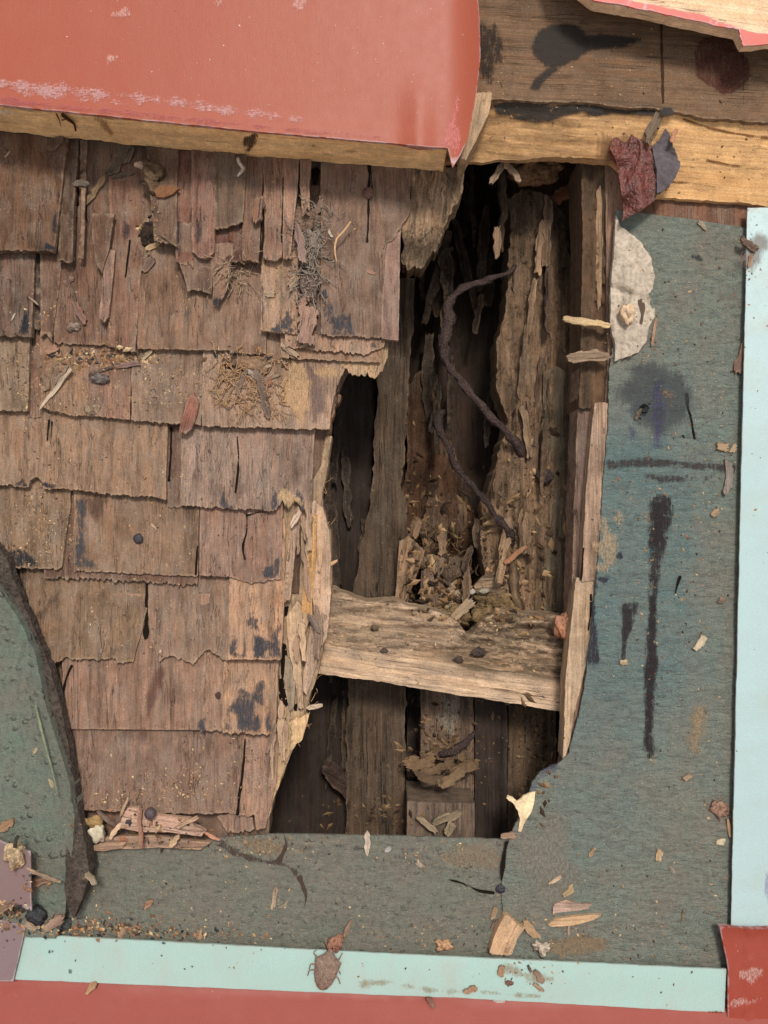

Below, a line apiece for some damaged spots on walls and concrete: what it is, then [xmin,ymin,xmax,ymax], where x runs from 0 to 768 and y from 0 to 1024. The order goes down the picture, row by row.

leakage [695,36,751,94]
crack [235,437,269,560]
crack [142,582,150,640]
peeling [451,571,508,620]
leakage [645,596,658,750]
leakage [225,680,271,733]
peeling [506,791,535,832]
crack [219,836,307,906]
crack [449,841,509,894]